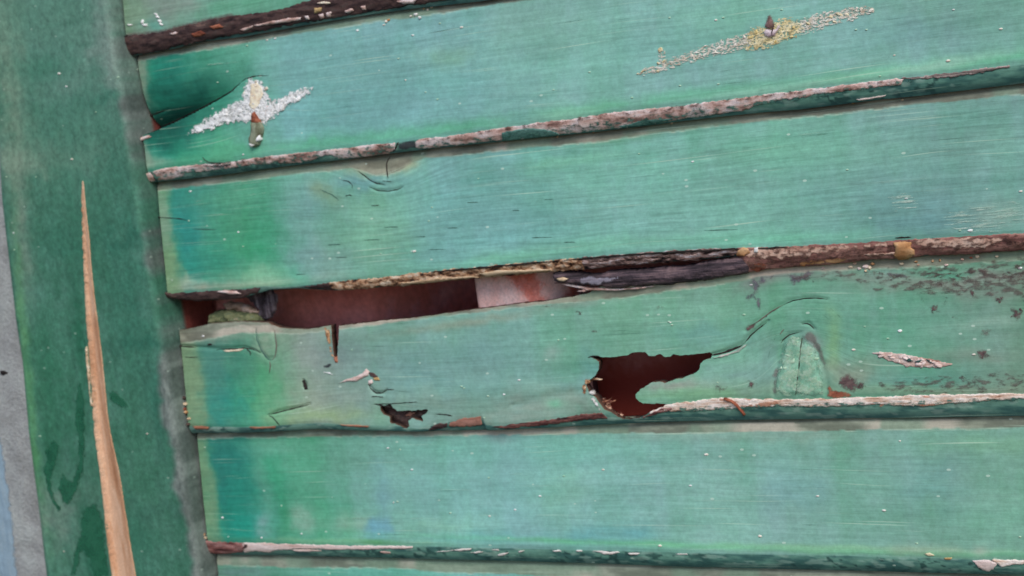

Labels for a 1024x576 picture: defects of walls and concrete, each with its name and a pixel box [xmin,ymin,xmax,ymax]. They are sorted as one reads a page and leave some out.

peeling [636,6,875,76]
peeling [146,65,1010,182]
water stain [790,271,862,283]
water stain [873,261,1024,318]
crack [712,297,824,358]
crack [256,330,277,374]
peeling [872,352,952,368]
water stain [881,373,1023,393]
spalling [376,404,482,430]
peeling [642,393,1024,418]